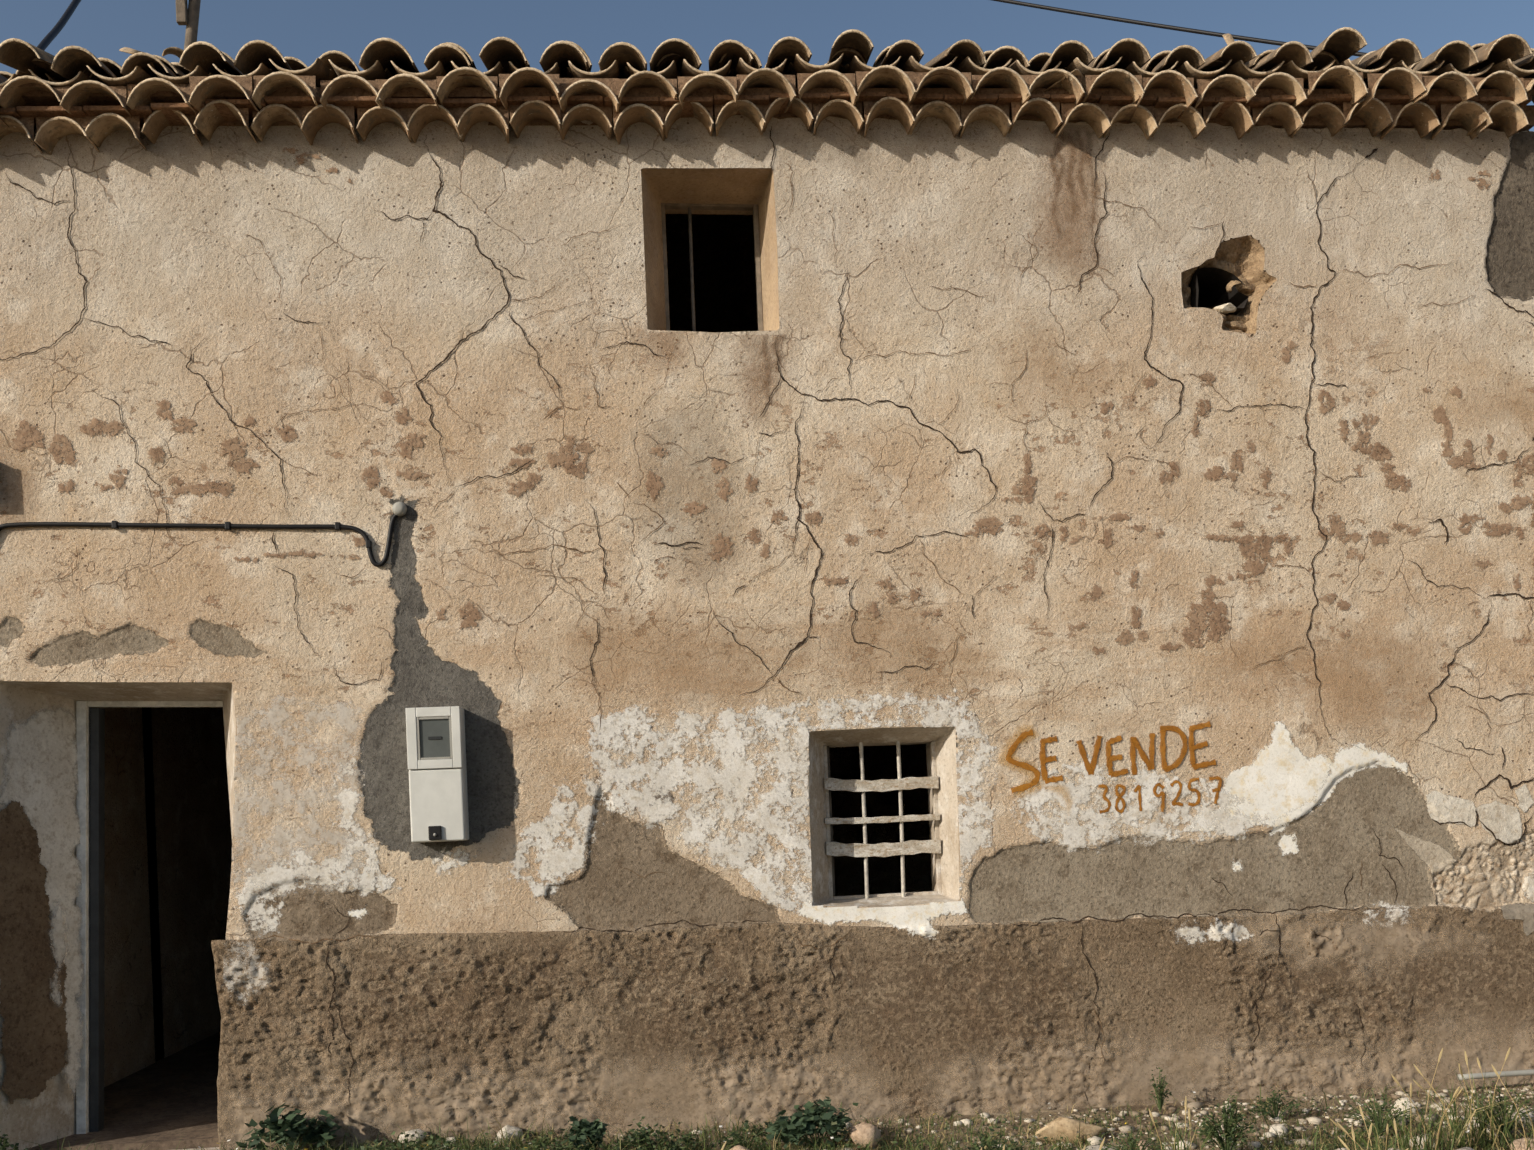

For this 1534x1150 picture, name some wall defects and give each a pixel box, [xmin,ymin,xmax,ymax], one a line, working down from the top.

spalling [0,708,85,1104]
spalling [28,622,171,667]
crack [0,152,382,685]
spalling [189,618,266,658]
crack [375,135,679,512]
crack [487,483,703,730]
crack [686,204,1076,704]
spalling [508,688,1534,967]
spalling [1181,235,1277,334]
crack [1039,134,1534,751]
crack [1404,518,1534,846]
spalling [1468,130,1534,301]